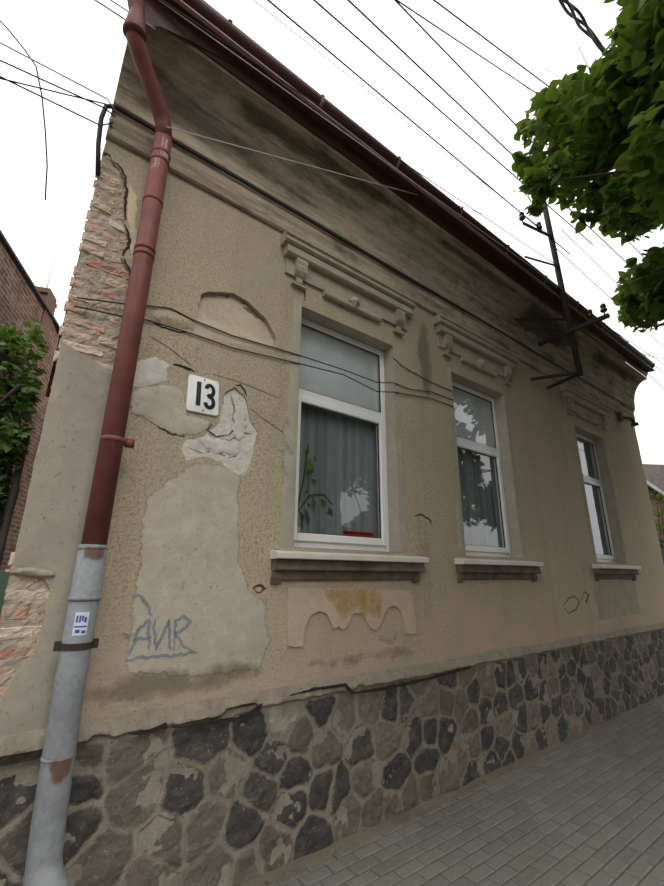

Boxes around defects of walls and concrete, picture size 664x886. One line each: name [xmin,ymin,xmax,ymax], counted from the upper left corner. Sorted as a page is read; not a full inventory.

damp [165,82,252,156]
damp [245,99,381,197]
flaking render [52,150,137,369]
flaking render [182,388,257,475]
flaking render [0,552,55,698]